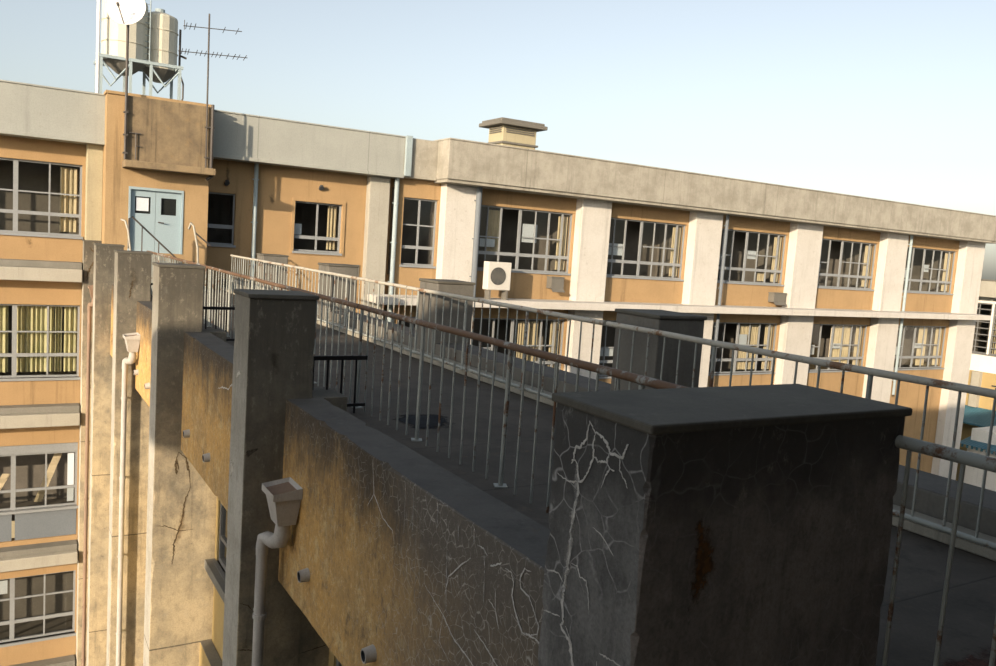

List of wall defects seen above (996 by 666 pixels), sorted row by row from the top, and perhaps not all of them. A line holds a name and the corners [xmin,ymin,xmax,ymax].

crack [161,452,192,563]
crack [426,421,629,666]